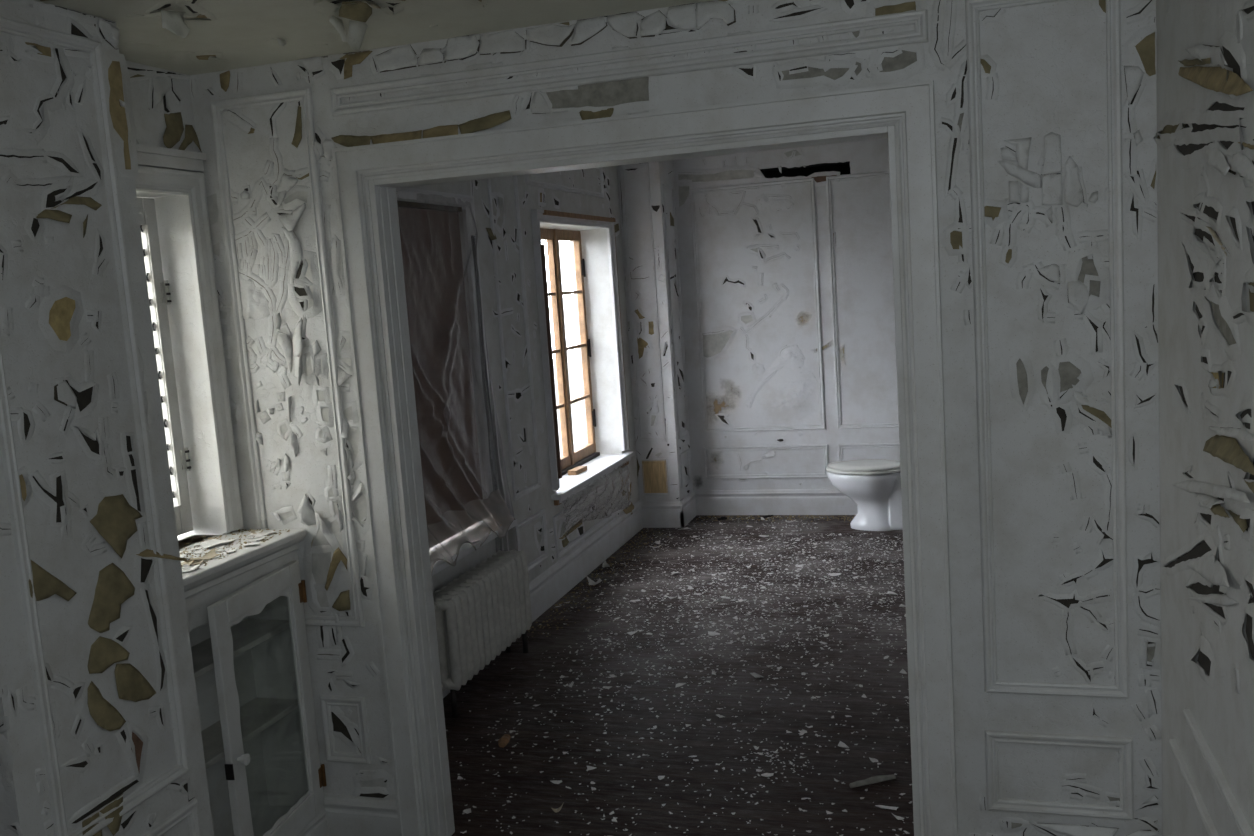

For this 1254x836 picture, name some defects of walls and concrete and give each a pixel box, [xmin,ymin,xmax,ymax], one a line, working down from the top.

peeling [126,0,217,39]
peeling [442,0,927,89]
spalling [754,157,871,187]
peeling [721,217,800,306]
peeling [528,200,693,571]
peeling [702,326,737,361]
peeling [1122,0,1254,687]
peeling [7,71,660,836]
peeling [1038,548,1115,684]